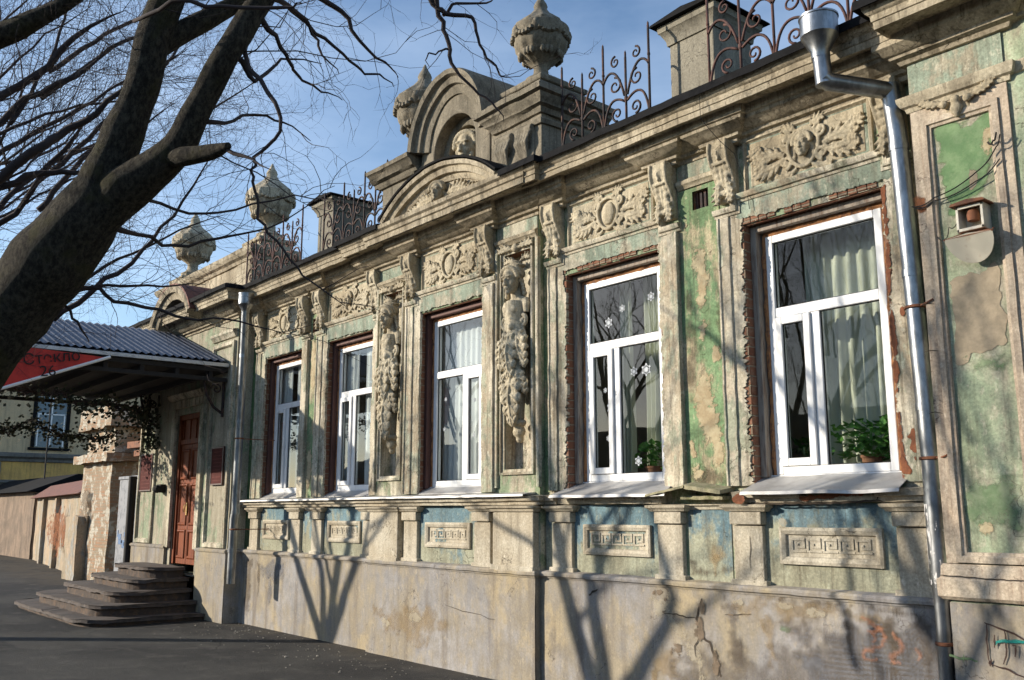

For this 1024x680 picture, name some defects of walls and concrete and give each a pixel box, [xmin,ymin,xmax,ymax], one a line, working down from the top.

peeling [934,111,992,216]
peeling [688,243,725,480]
crack [664,598,751,677]